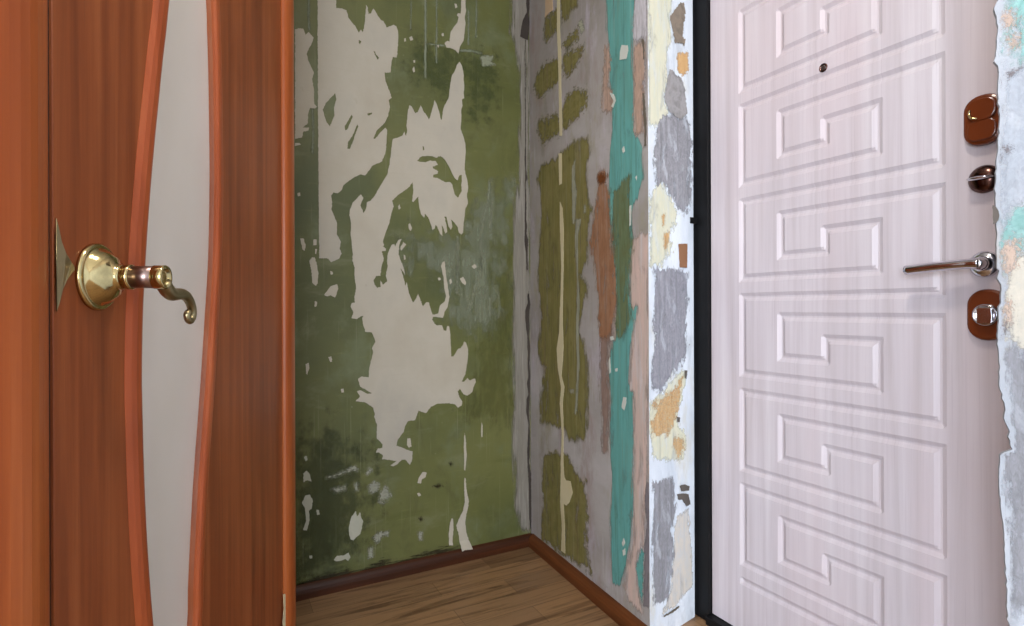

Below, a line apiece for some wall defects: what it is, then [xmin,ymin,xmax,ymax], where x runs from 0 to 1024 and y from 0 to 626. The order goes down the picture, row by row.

peeling [437,0,466,53]
spalling [670,2,686,46]
peeling [620,45,628,60]
peeling [295,28,317,146]
spalling [664,69,687,119]
peeling [300,238,338,307]
peeling [302,495,320,530]
peeling [349,511,363,540]
peeling [449,433,473,551]
spalling [677,484,690,507]